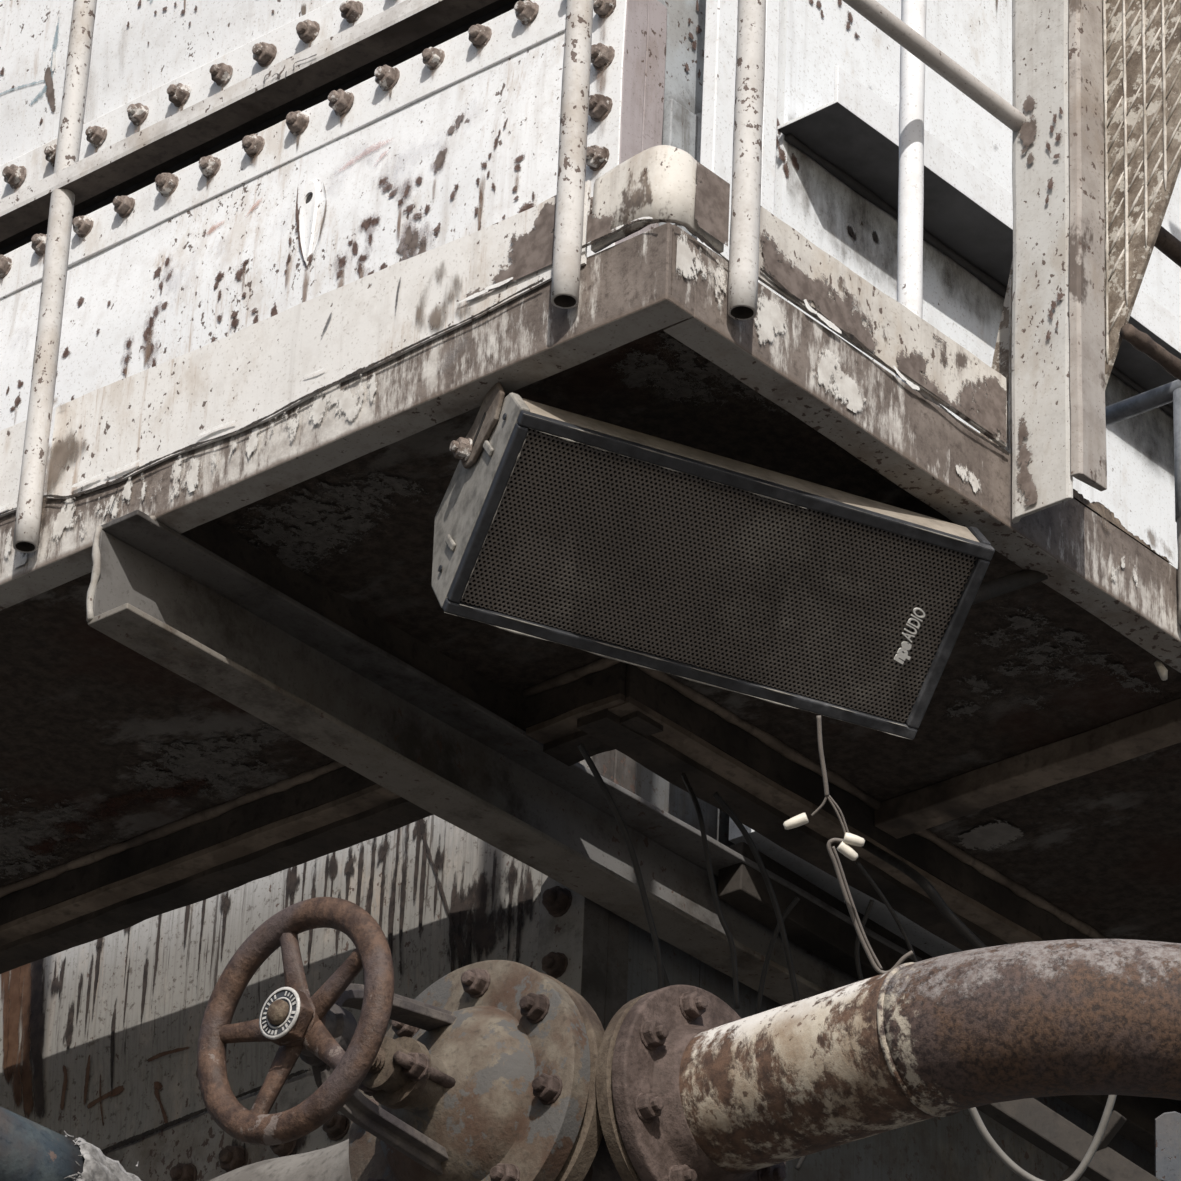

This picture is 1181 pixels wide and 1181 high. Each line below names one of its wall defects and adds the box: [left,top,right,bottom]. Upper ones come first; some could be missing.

corrosion [1017,95,1063,164]
corrosion [214,259,278,330]
corrosion [284,184,327,302]
peeling [466,202,556,299]
peeling [695,161,730,246]
peeling [755,229,877,352]
peeling [896,333,1038,507]
corrosion [1,958,45,1119]
damp [48,937,103,1051]
damp [141,914,162,1025]
damp [184,900,206,979]
damp [285,820,480,974]